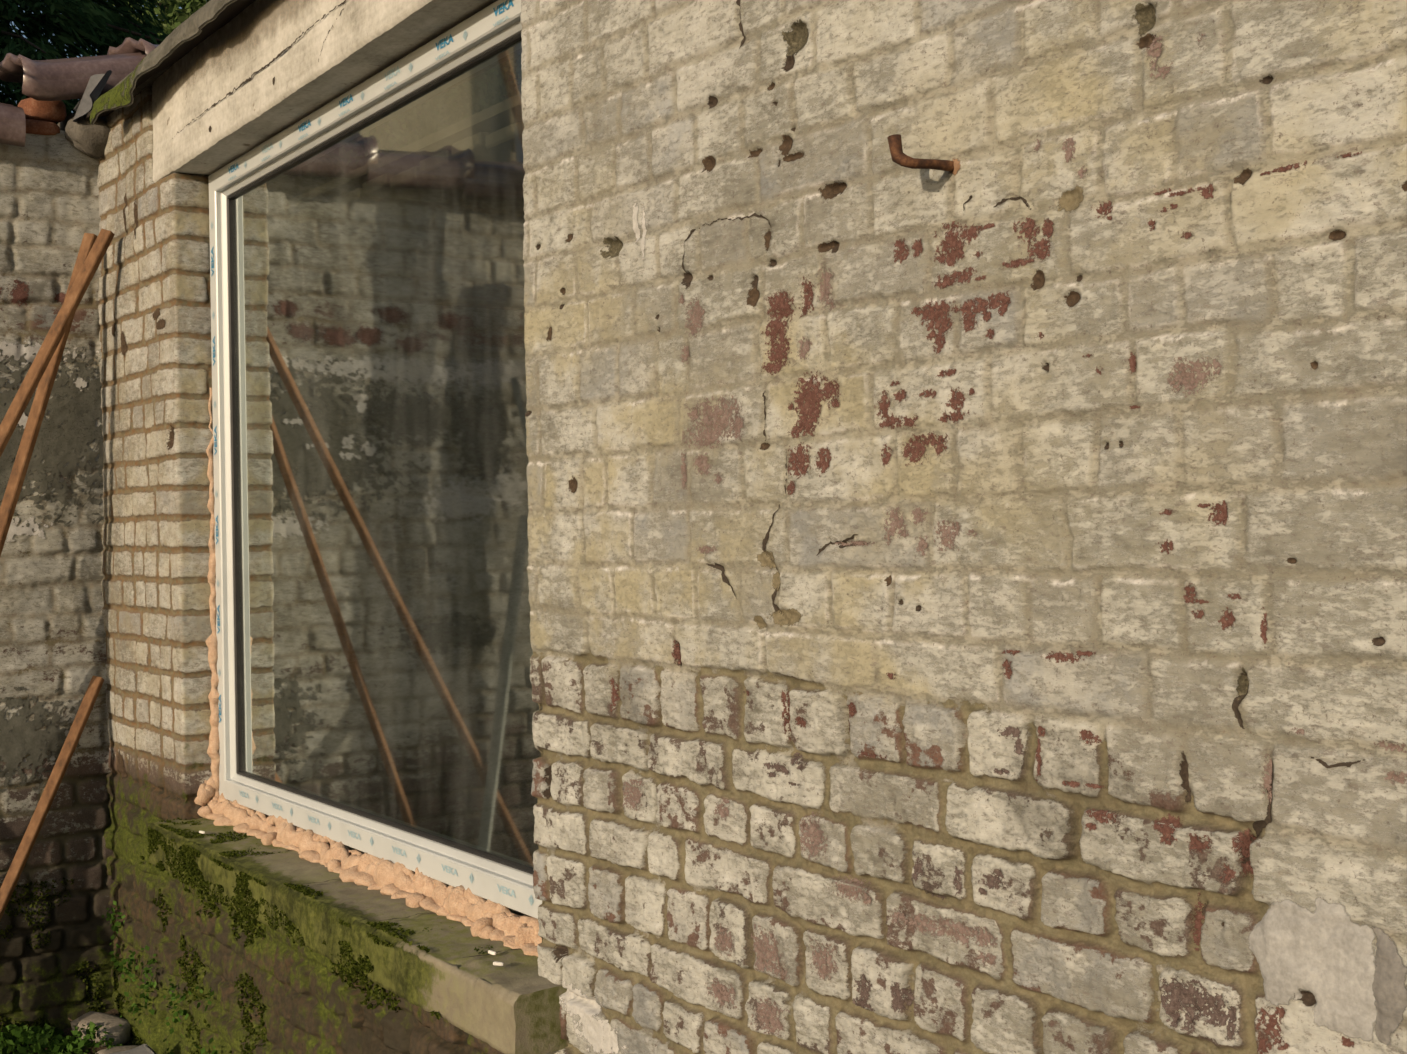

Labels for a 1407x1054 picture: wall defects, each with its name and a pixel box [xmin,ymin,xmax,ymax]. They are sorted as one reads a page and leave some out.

peeling [1002,138,1113,291]
peeling [892,219,1014,354]
peeling [874,368,975,467]
crack [707,563,736,597]
crack [762,392,787,620]
crack [816,534,868,556]
peeling [763,686,806,786]
crack [1232,673,1249,729]
crack [1253,761,1273,839]
crack [1311,757,1365,768]
peeling [912,851,1007,899]
peeling [808,938,914,1013]